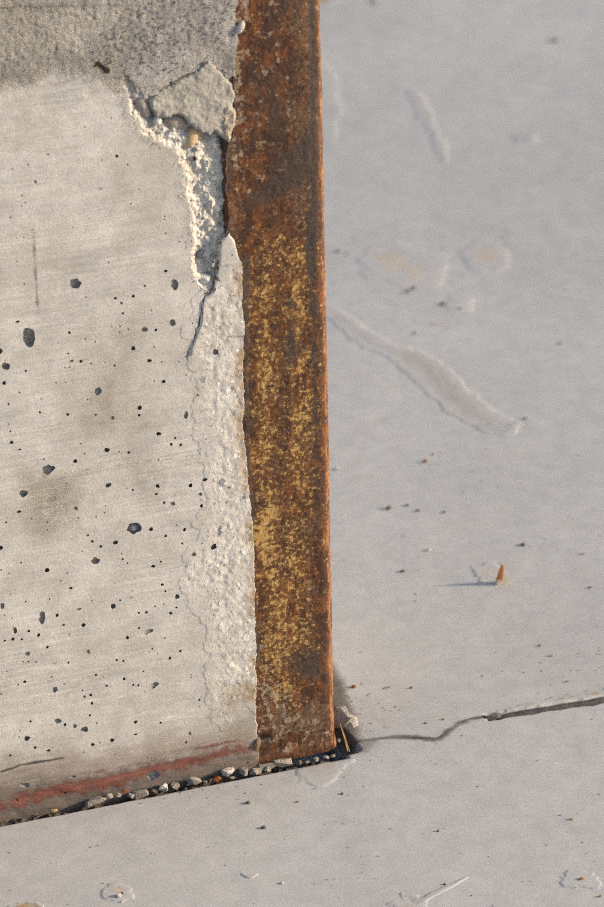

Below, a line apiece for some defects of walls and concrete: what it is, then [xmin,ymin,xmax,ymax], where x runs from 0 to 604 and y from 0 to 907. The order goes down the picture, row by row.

crack [187,231,230,359]
peeling [0,0,257,732]
crack [353,716,485,747]